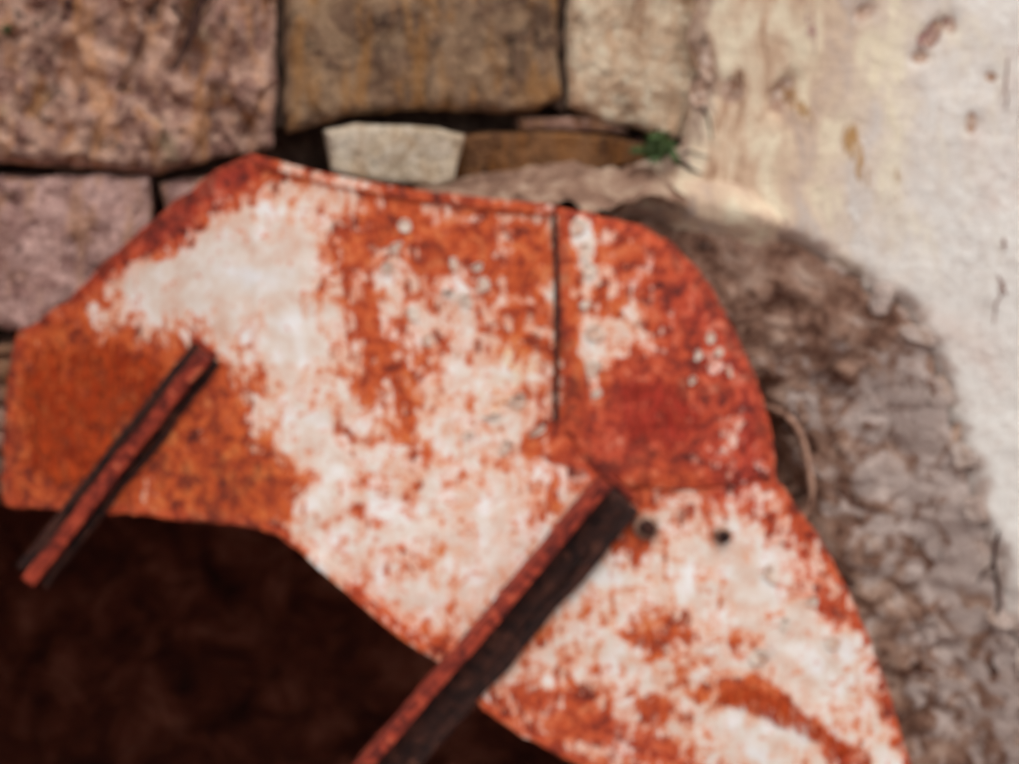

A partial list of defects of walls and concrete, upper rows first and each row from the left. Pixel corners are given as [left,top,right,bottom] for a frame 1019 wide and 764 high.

corrosion [720,685,869,764]
spalling [625,218,1019,764]